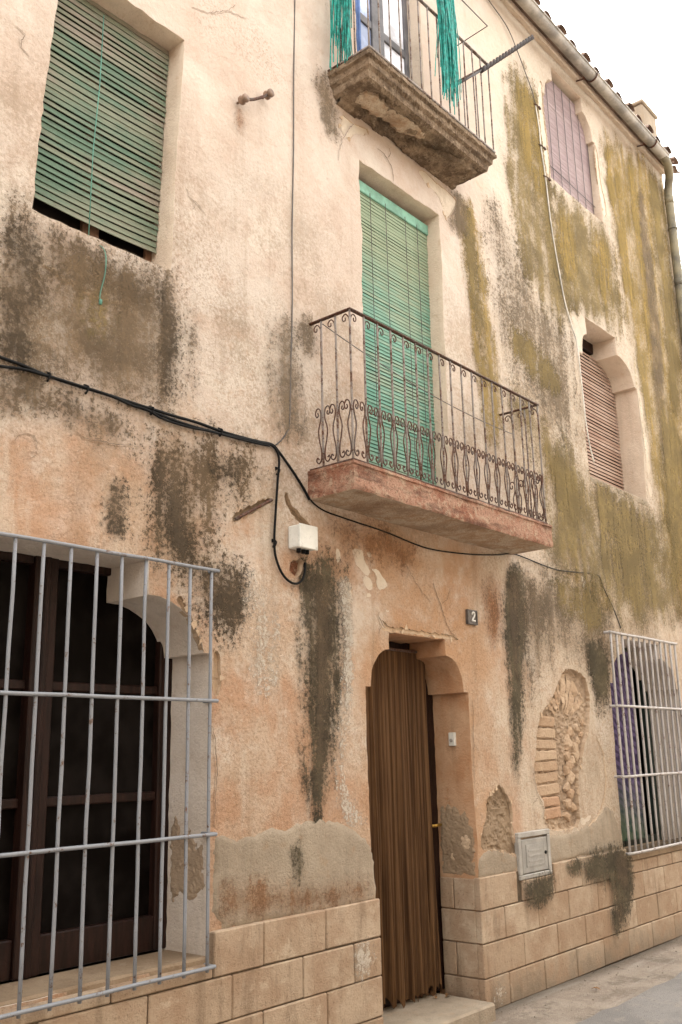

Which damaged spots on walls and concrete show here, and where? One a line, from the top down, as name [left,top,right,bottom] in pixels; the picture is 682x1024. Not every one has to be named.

leakage [311,70,342,143]
leakage [0,187,280,696]
leakage [449,61,682,772]
peeling [336,548,387,617]
leakage [293,546,366,828]
flaking render [534,668,591,837]
flaking render [169,816,205,902]
flaking render [440,785,515,876]
leakage [524,871,556,910]
leakage [567,843,635,939]